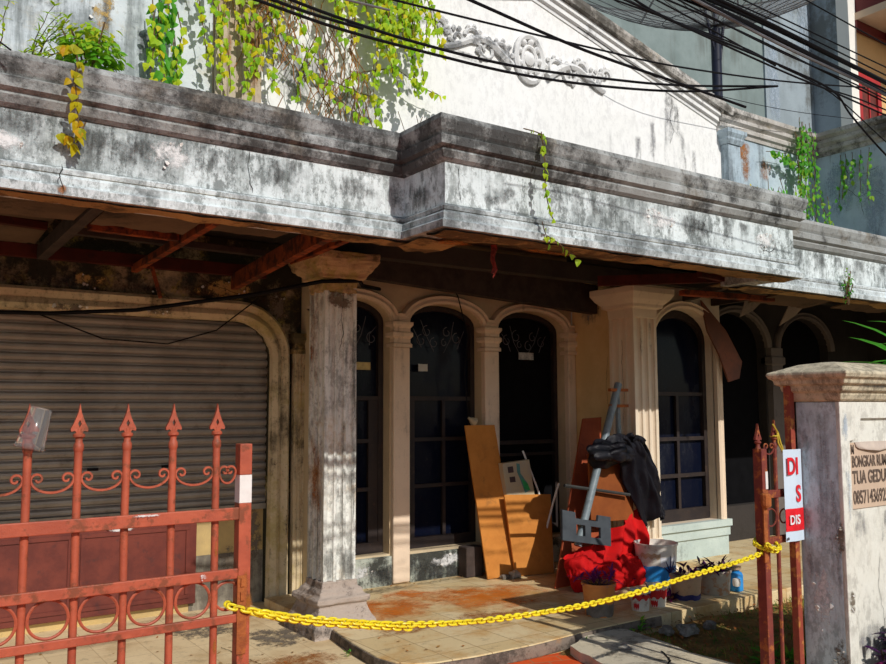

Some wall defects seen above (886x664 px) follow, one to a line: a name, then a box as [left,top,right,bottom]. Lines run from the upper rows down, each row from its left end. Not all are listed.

water stain [267,25,368,123]
corrosion [740,144,749,179]
water stain [251,509,261,557]
corrosion [368,585,534,634]